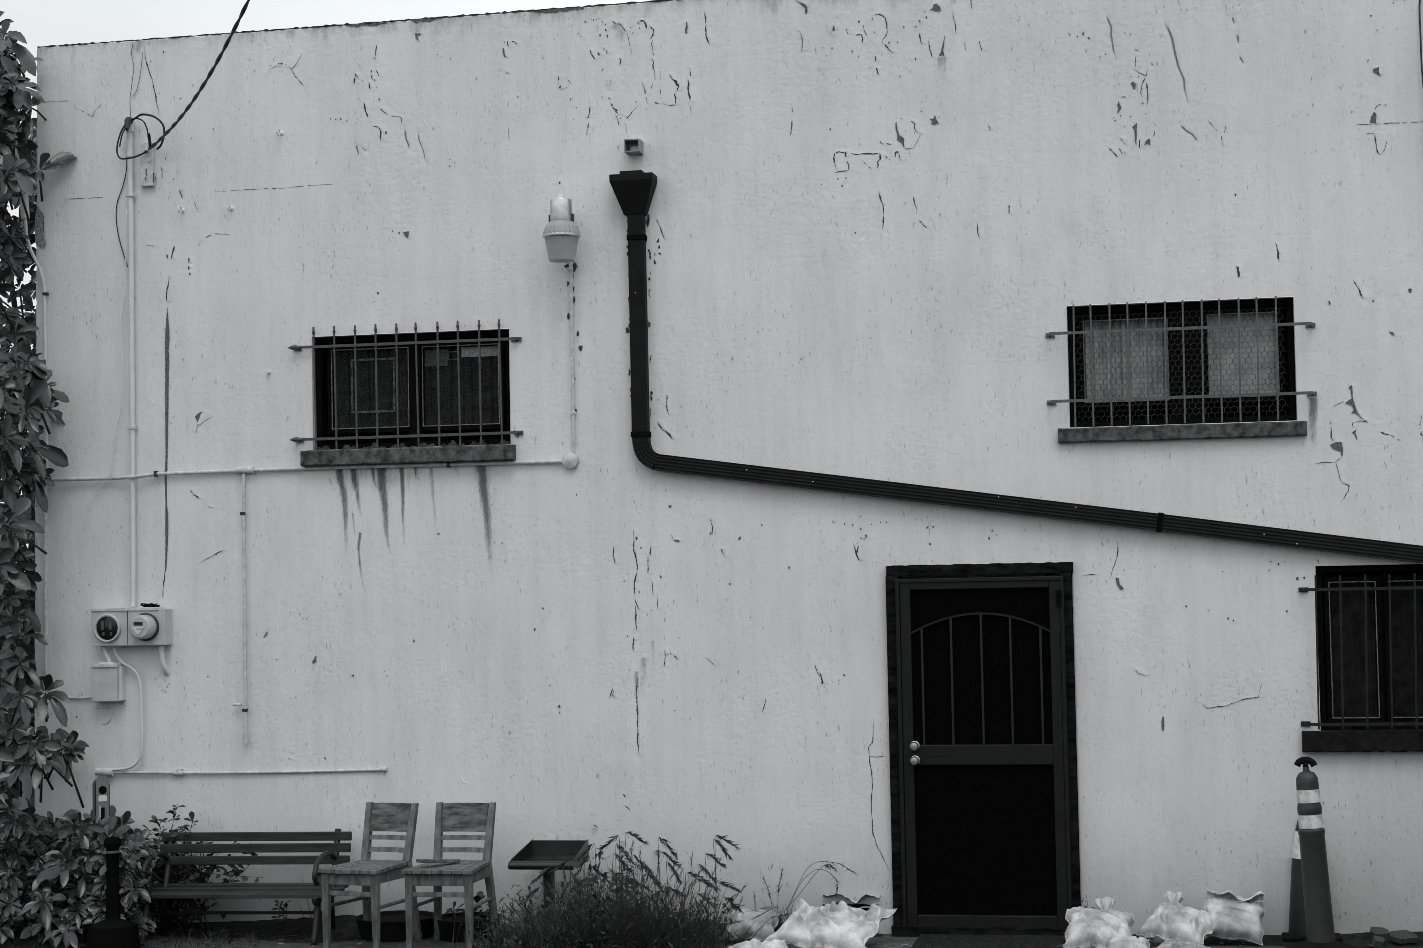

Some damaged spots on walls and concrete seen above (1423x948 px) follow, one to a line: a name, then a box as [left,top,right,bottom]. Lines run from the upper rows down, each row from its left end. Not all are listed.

spalling [534,7,632,53]
peeling [602,69,679,125]
peeling [886,111,939,160]
peeling [1368,104,1387,154]
peeling [1316,385,1400,464]
damp [337,467,417,523]
damp [478,465,489,536]